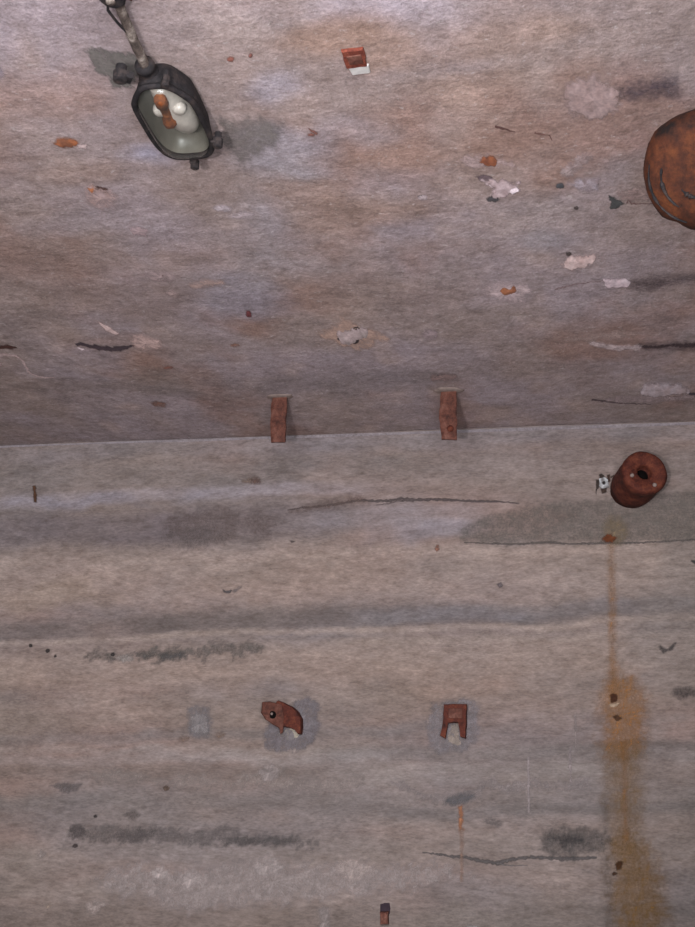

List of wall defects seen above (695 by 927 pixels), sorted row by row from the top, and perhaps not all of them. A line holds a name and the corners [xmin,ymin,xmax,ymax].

leakage [87,48,139,88]
spalling [478,175,521,202]
crack [289,497,519,510]
leakage [85,646,220,663]
leakage [70,811,310,848]
crack [422,852,597,866]